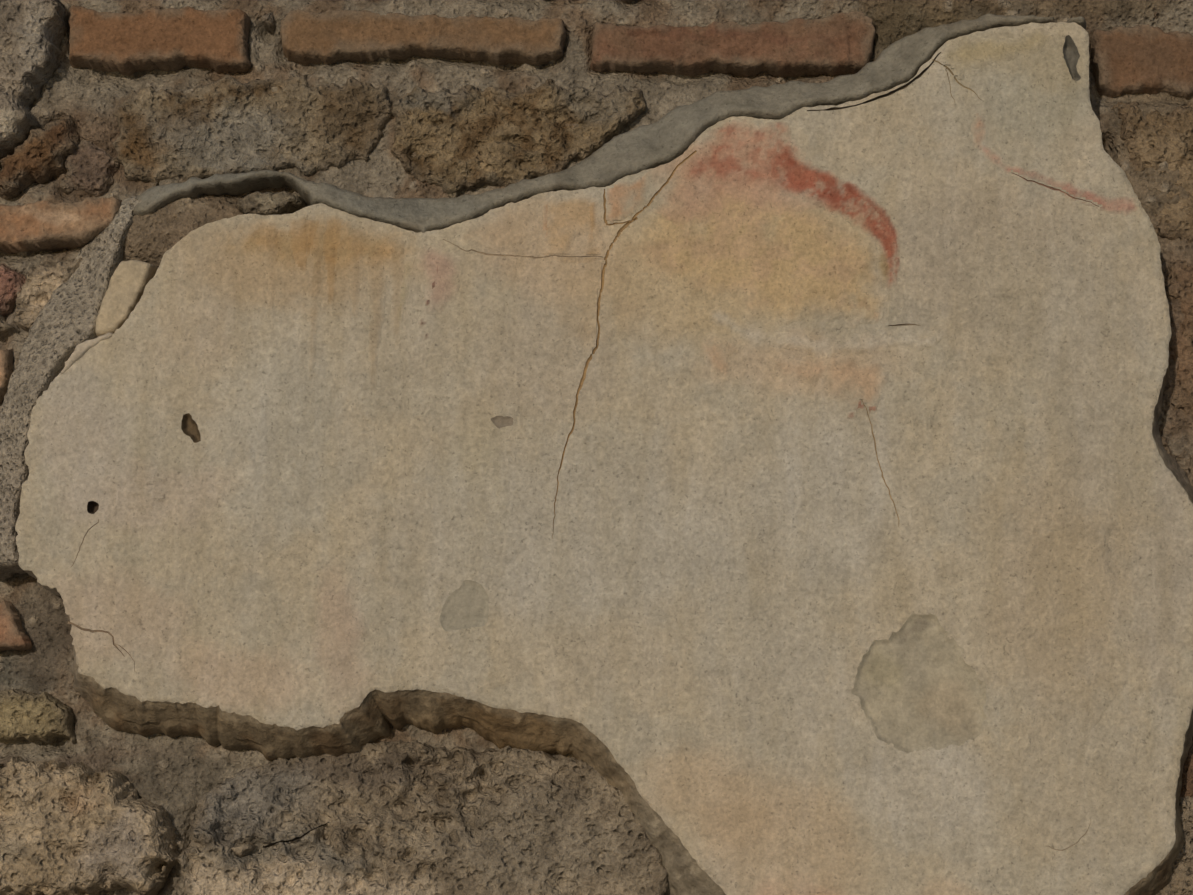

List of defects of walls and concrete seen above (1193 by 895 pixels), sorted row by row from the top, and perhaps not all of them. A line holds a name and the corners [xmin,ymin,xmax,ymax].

crack [1011,172,1099,207]
crack [443,150,697,539]
crack [862,401,899,527]
crack [68,621,137,673]